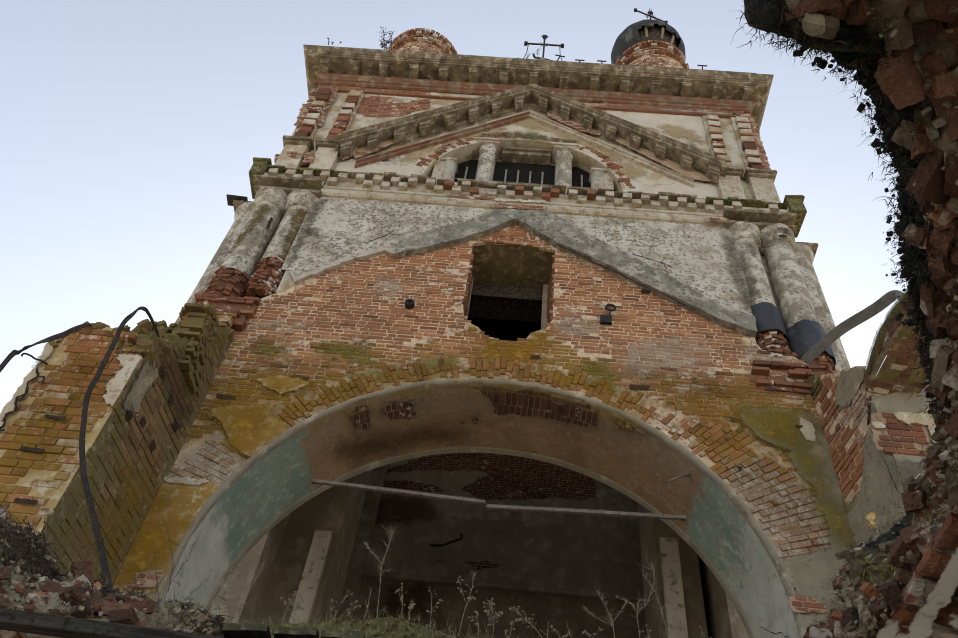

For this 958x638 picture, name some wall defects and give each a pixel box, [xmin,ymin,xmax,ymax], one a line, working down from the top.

spalling [294,84,431,126]
spalling [785,0,958,638]
spalling [347,400,416,430]
spalling [478,387,597,427]
flaking render [163,475,209,487]
spalling [383,453,596,501]
damp [715,398,852,545]
spalling [0,509,229,637]